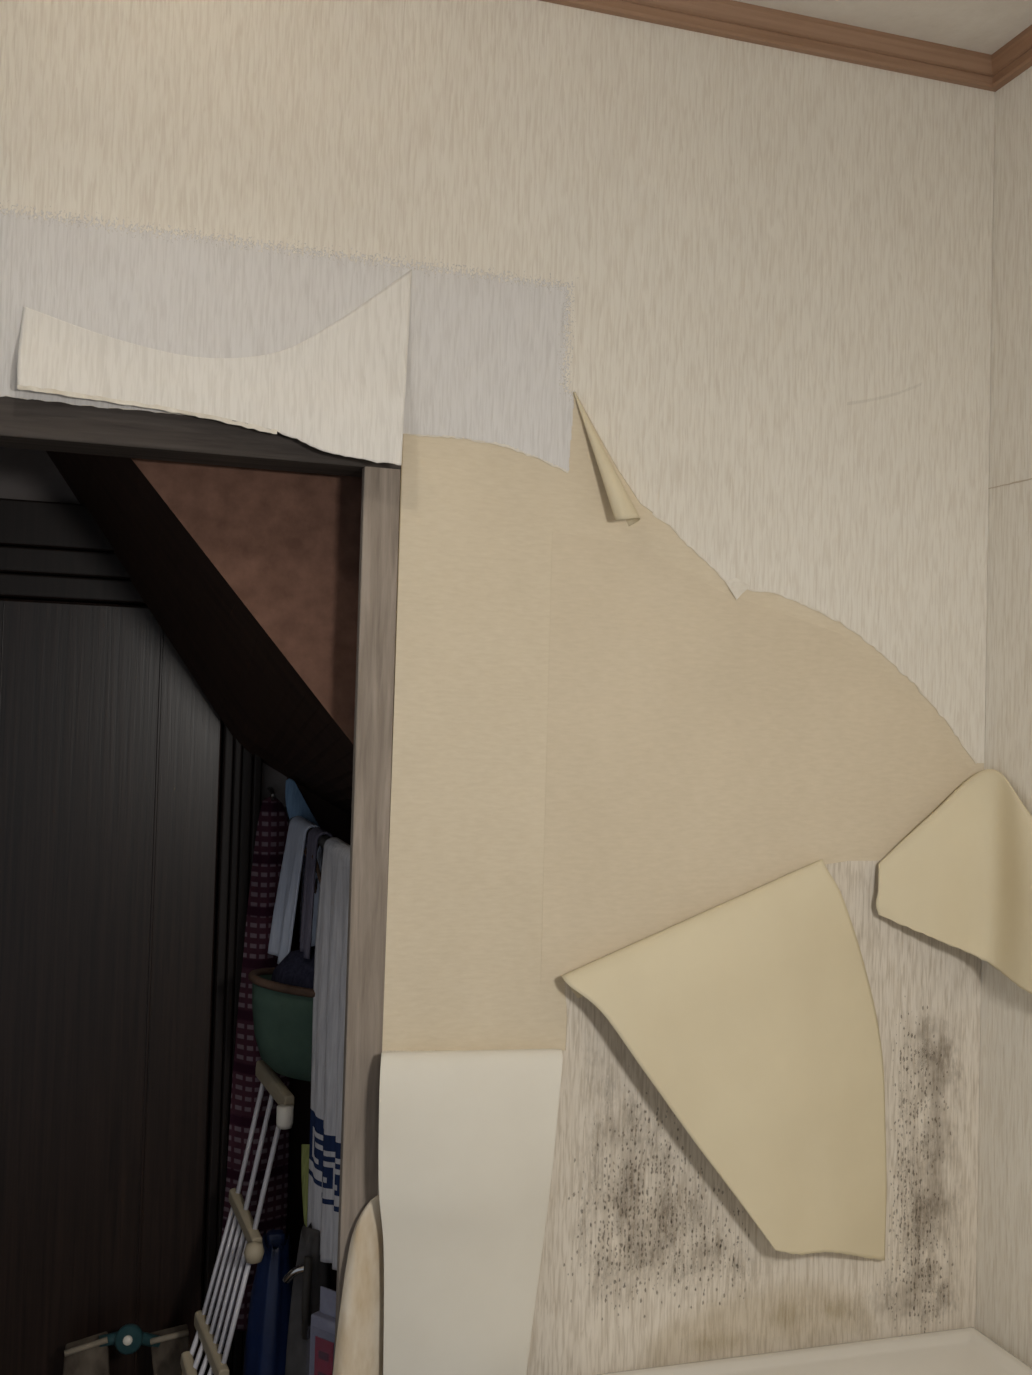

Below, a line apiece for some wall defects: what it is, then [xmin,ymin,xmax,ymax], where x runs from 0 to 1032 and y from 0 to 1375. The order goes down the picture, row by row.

peeling [382,392,984,1051]